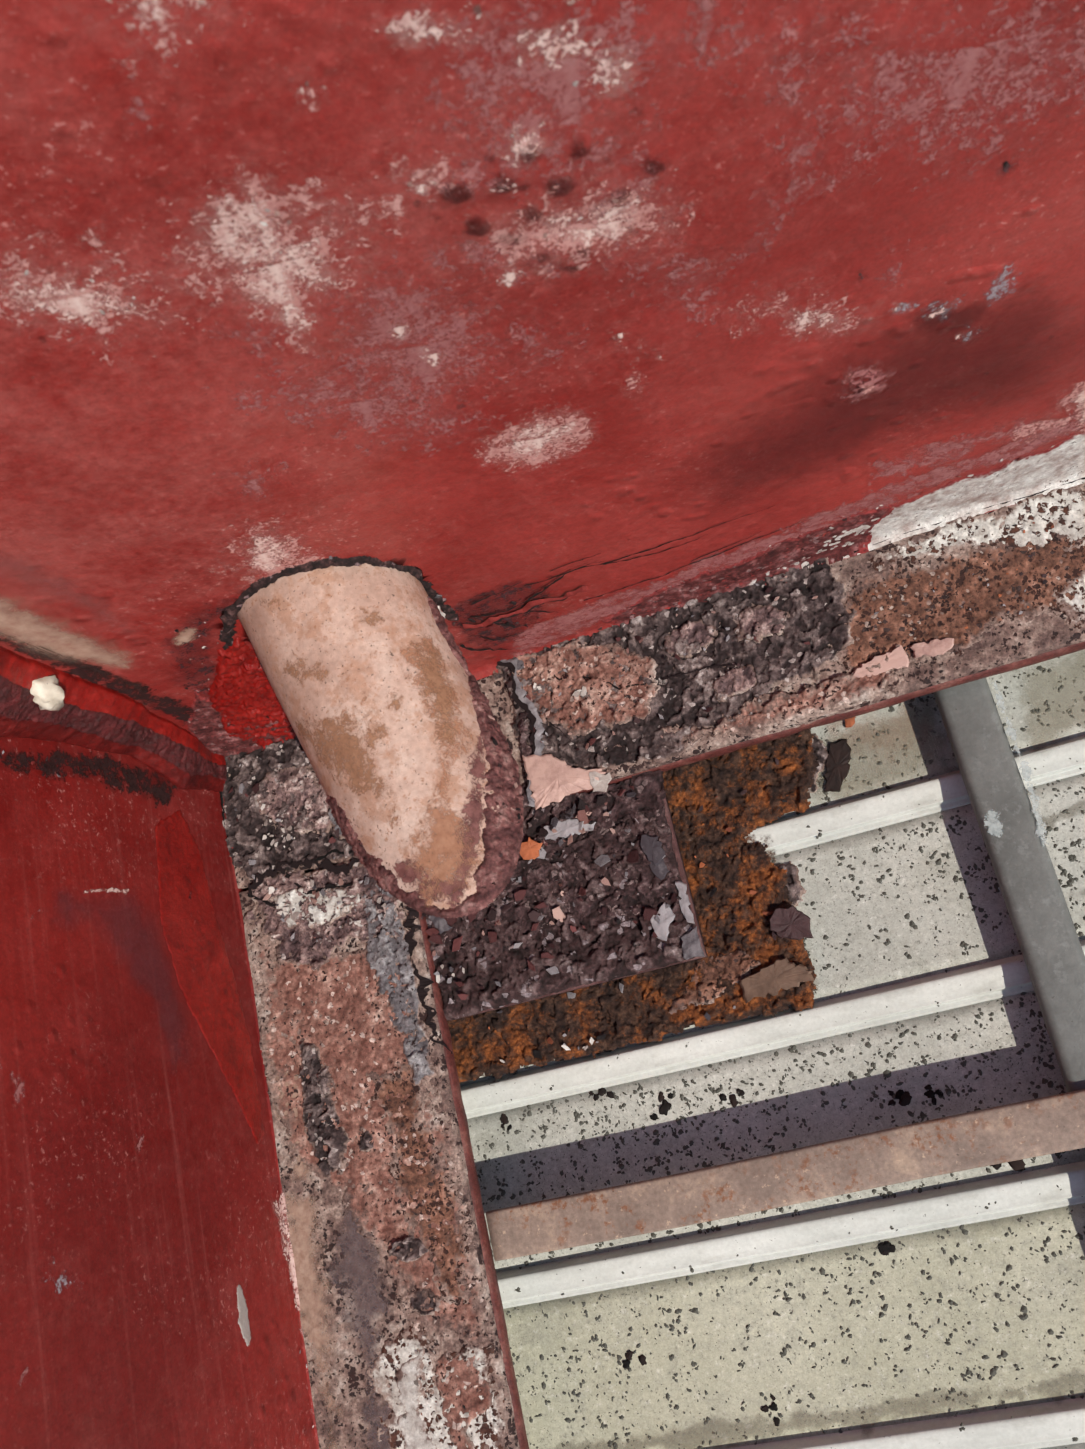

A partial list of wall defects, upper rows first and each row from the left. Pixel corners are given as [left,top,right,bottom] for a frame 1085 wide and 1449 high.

peeling [435,381,1085,657]
water stain [0,600,194,725]
mould [0,748,177,808]
crack [195,751,233,848]
crack [247,849,363,907]
crack [401,903,452,1054]
corrosion [184,532,1085,1449]